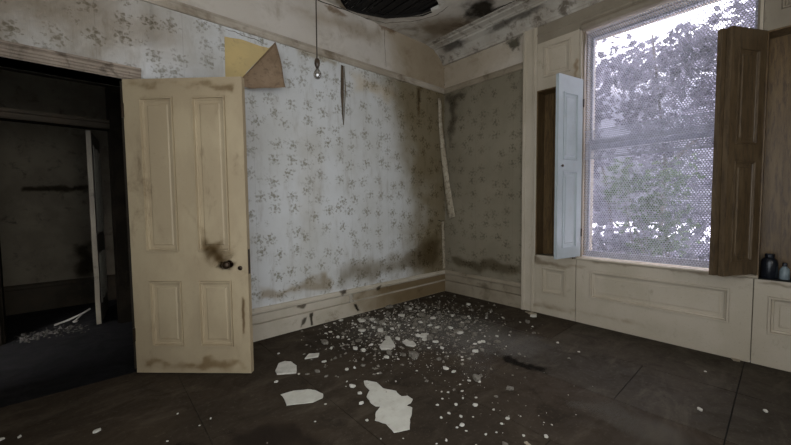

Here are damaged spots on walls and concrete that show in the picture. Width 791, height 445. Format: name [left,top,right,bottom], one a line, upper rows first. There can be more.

water stain [402,83,461,273]
peeling [438,98,455,269]